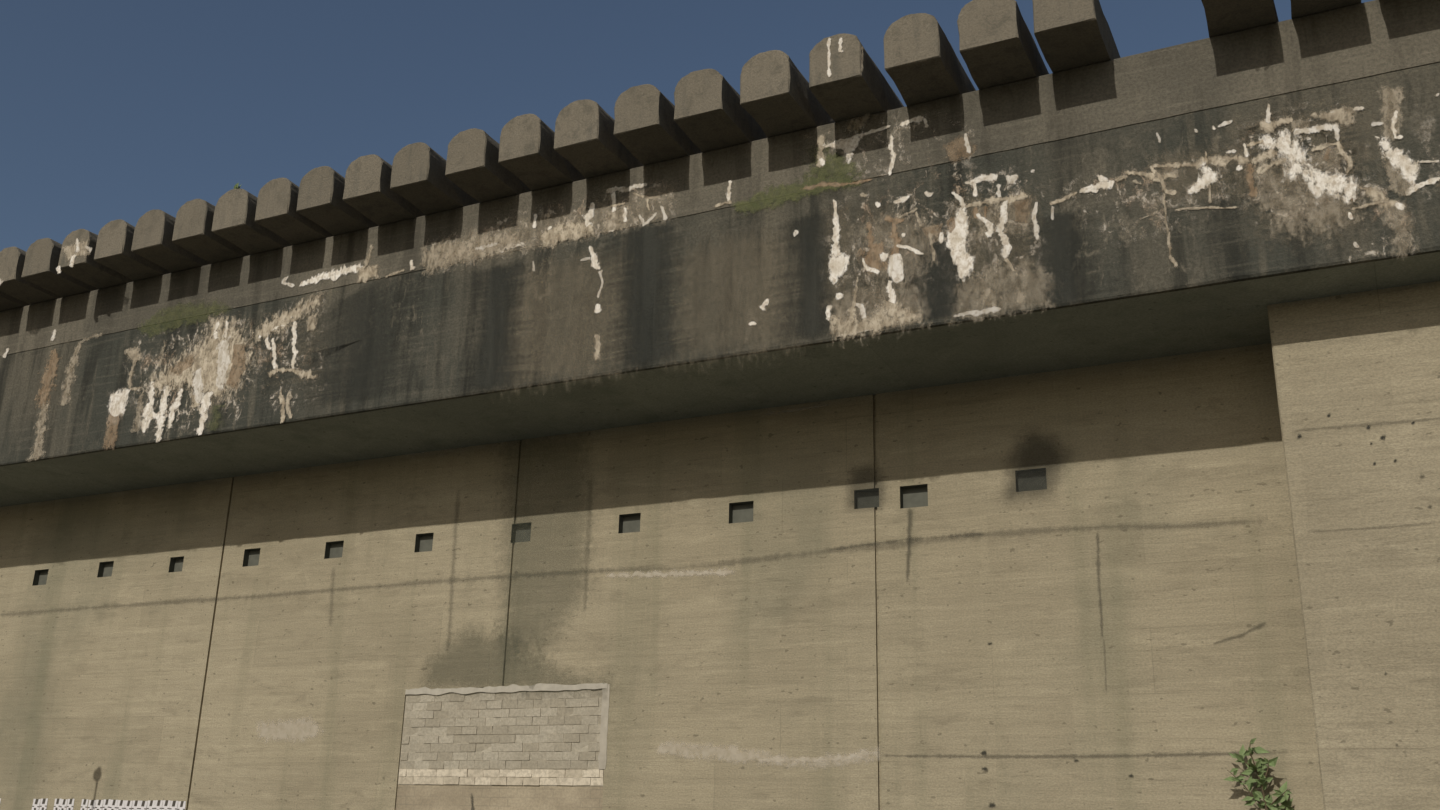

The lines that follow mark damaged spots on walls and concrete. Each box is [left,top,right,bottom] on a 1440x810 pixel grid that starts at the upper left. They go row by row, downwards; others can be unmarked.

spalling [816,113,890,167]
water stain [1152,88,1439,226]
spalling [426,183,673,272]
spalling [104,314,254,448]
water stain [470,263,524,389]
water stain [619,220,675,364]
spalling [825,277,922,338]